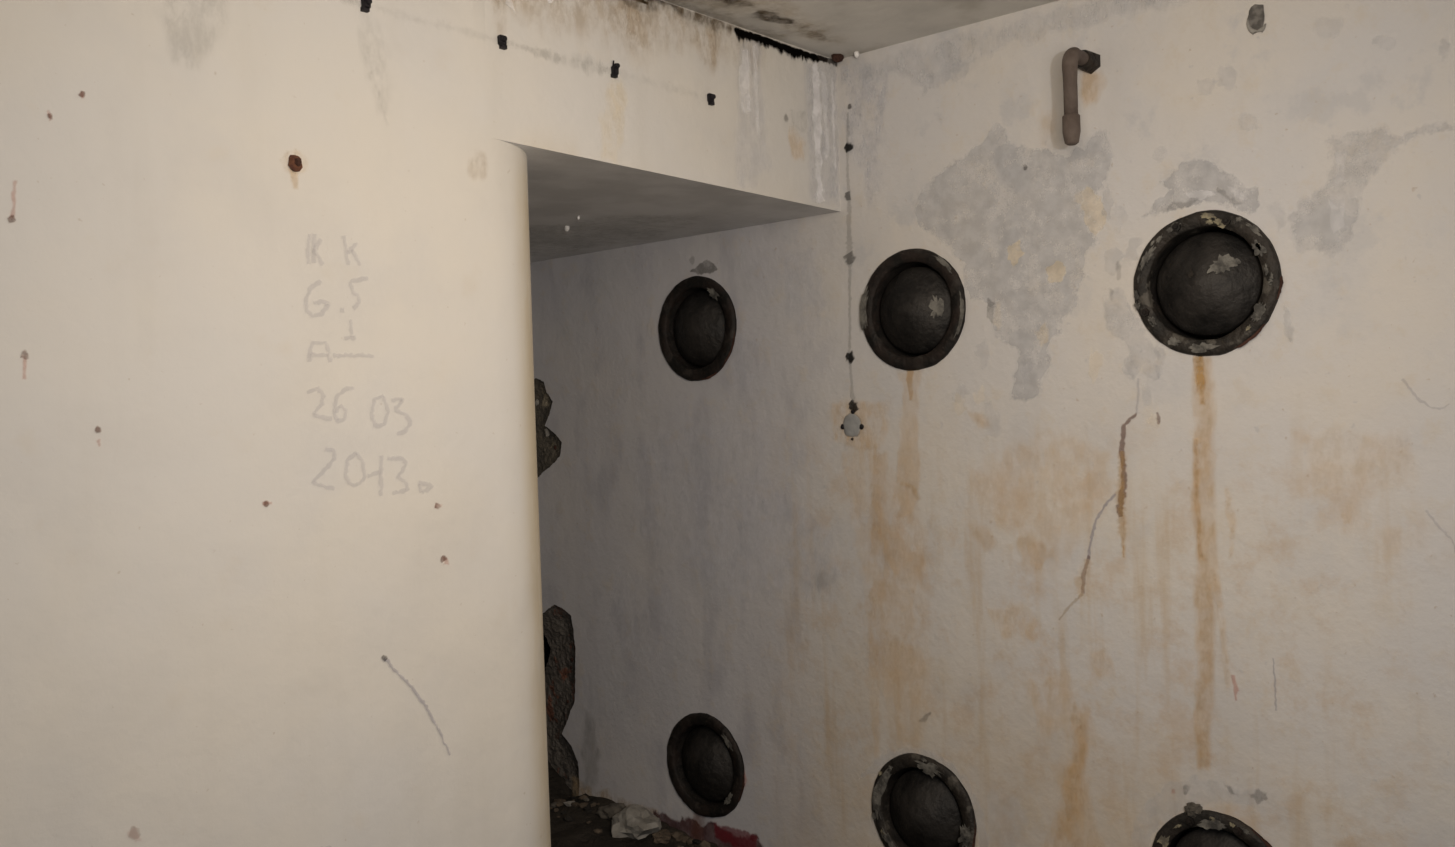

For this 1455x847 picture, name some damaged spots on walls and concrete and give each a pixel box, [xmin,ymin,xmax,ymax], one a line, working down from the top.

leakage [757,11,793,24]
peeling [929,291,965,337]
spalling [534,378,562,477]
spalling [543,605,580,796]